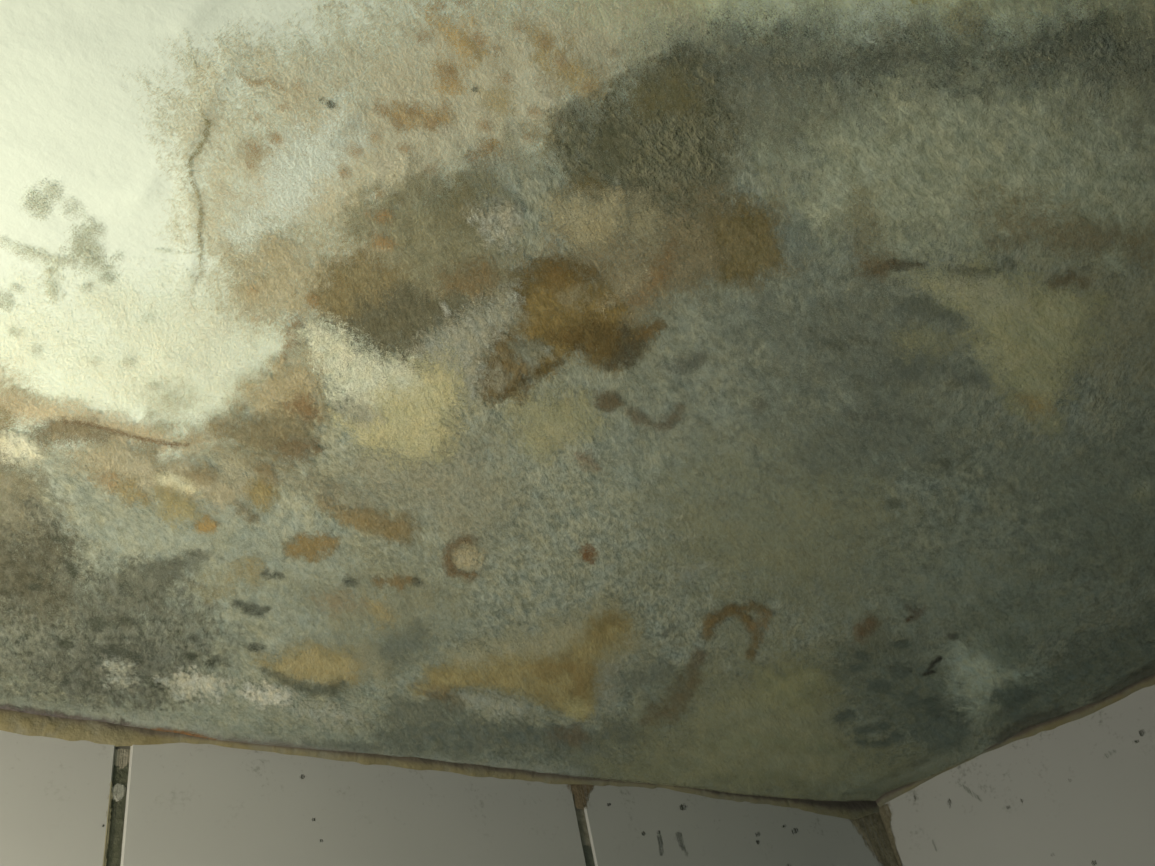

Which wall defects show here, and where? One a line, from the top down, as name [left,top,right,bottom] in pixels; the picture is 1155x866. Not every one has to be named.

crack [155,38,213,322]
damp [102,748,130,866]